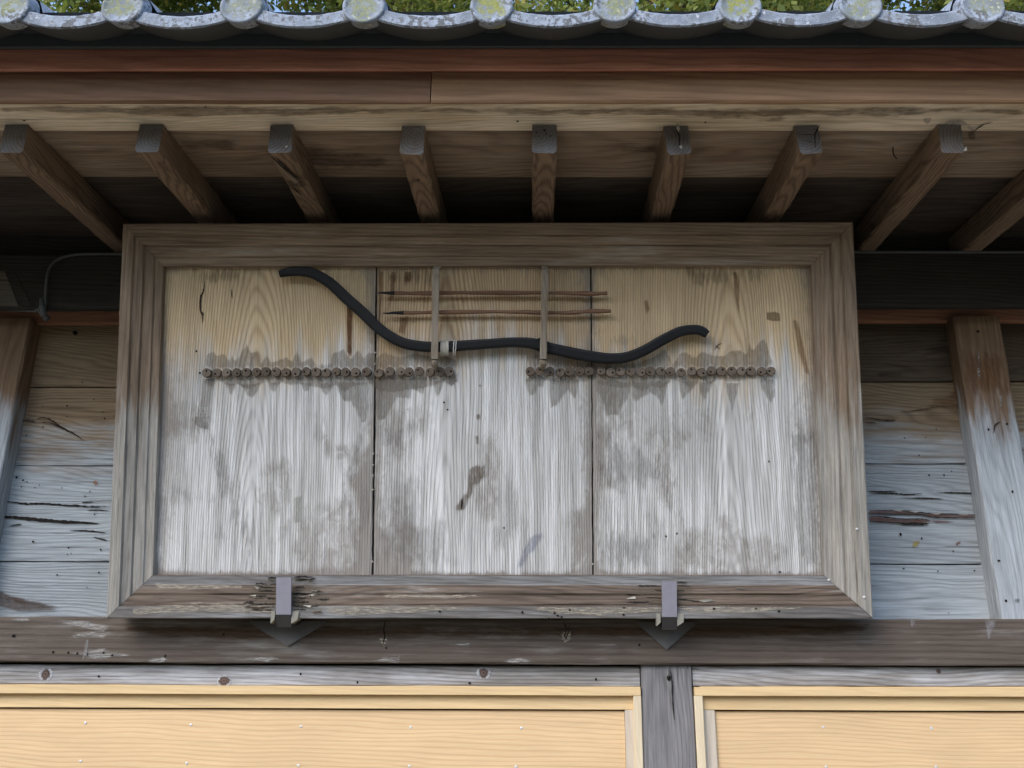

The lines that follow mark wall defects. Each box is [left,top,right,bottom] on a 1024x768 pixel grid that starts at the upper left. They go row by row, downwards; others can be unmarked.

crack [198,281,206,323]
crack [23,417,81,439]
crack [4,501,108,541]
crack [869,491,975,525]
peeling [294,578,323,614]